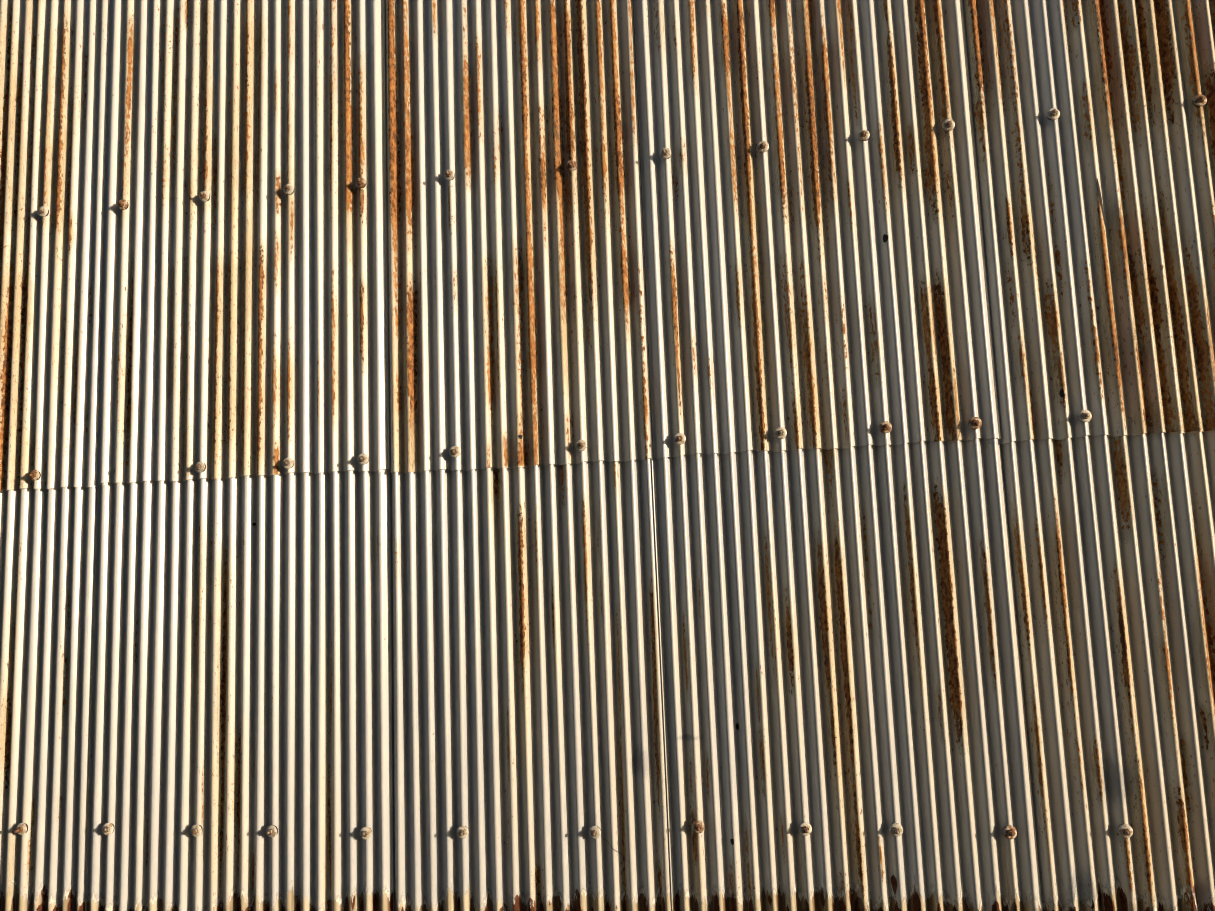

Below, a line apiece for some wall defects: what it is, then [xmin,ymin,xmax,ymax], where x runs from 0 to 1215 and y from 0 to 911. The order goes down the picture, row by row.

rust [0,0,104,491]
rust [116,258,138,466]
rust [150,0,370,477]
rust [386,0,460,467]
rust [446,3,503,234]
rust [480,0,650,505]
rust [647,0,858,451]
rust [774,260,884,909]
rust [871,0,959,223]
rust [901,484,970,748]
rust [915,273,960,441]
rust [1145,473,1215,911]